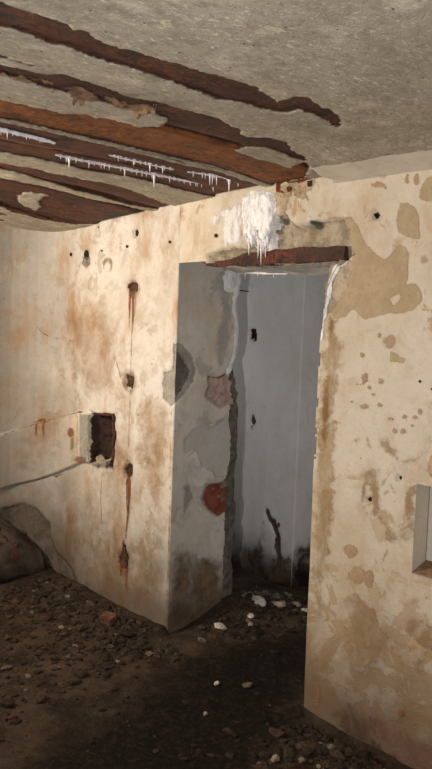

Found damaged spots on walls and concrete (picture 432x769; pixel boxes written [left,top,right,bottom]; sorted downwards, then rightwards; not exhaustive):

peeling [62,86,157,119]
peeling [405,174,432,201]
water stain [212,189,284,259]
peeling [209,179,422,341]
corrosion [128,282,138,325]
flaking render [162,344,196,406]
water stain [322,321,340,366]
peeling [183,373,234,531]
water stain [246,375,334,588]
corrosion [118,463,133,582]